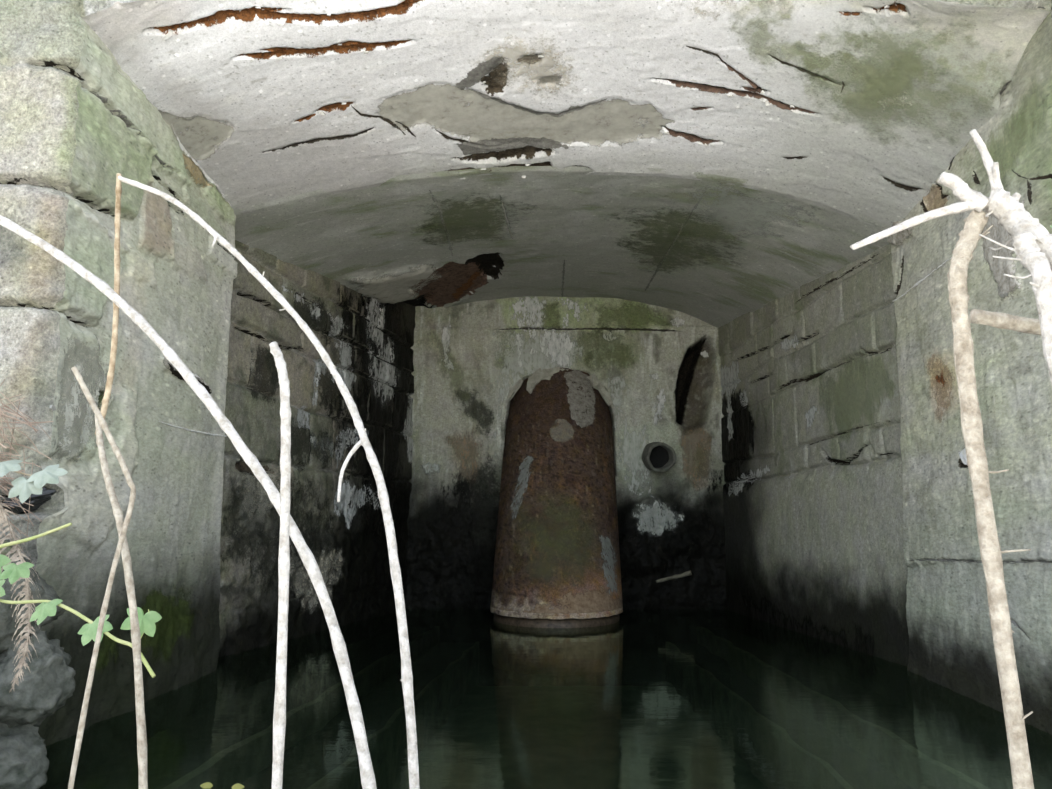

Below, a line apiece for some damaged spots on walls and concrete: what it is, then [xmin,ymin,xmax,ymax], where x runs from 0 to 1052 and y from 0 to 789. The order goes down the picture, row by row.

crack [262,102,468,153]
peeling [377,54,674,179]
crack [655,46,817,146]
crack [768,54,845,93]
peeling [411,252,504,307]
damp [223,285,414,600]
damp [510,456,533,519]
damp [406,456,500,609]
crack [908,557,1052,565]